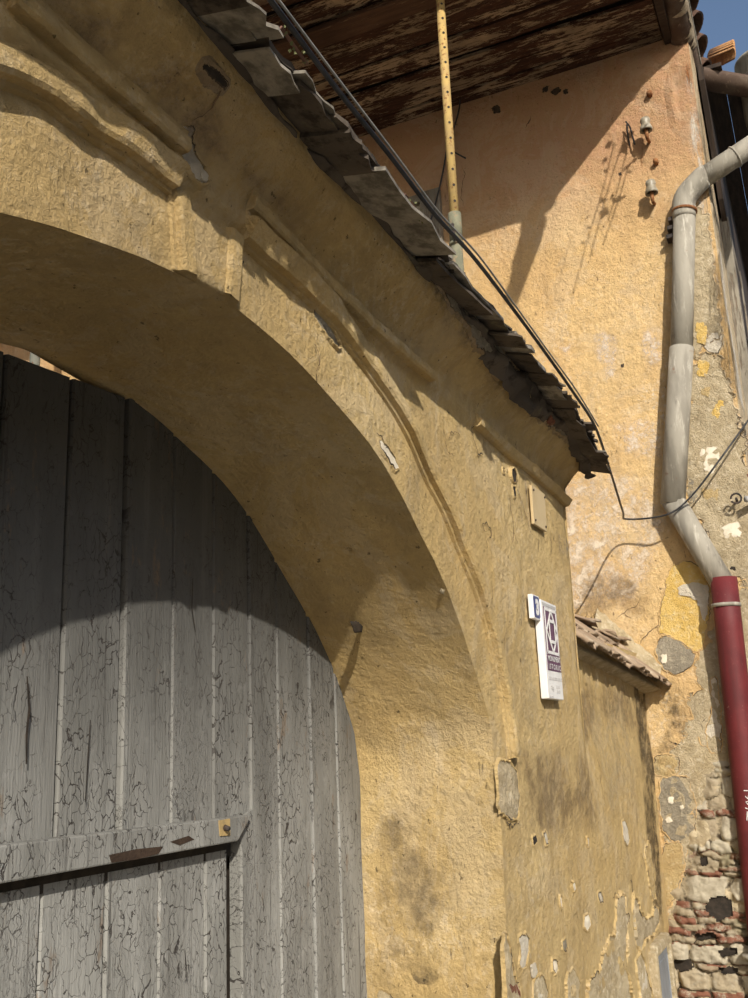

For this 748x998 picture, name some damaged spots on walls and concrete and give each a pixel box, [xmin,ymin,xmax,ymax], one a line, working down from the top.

spalling [311,309,342,351]
spalling [376,436,400,474]
peeling [686,207,748,668]
flaking render [500,560,729,998]
leakage [635,687,662,914]